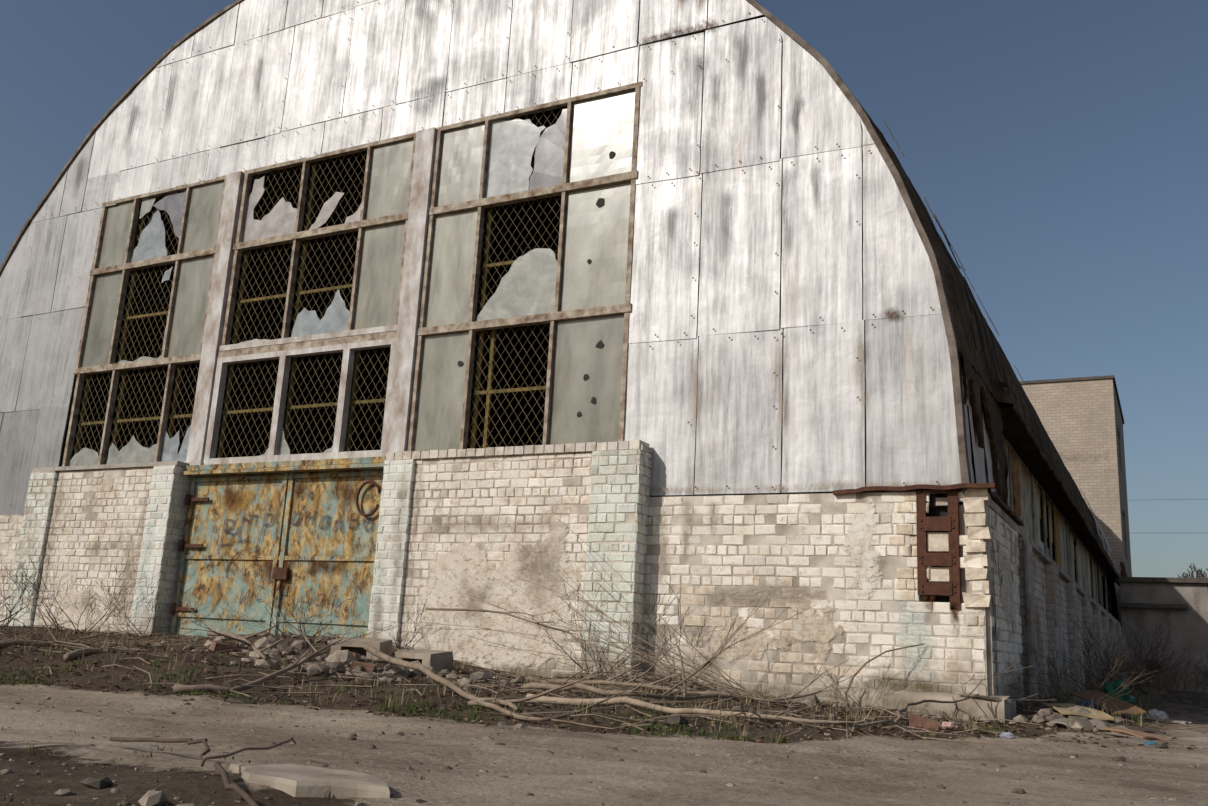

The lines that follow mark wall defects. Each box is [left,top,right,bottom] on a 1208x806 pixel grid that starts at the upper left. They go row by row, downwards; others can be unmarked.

rust [223,490,252,511]
rust [312,514,357,571]
rust [263,560,295,618]
crack [991,525,999,686]